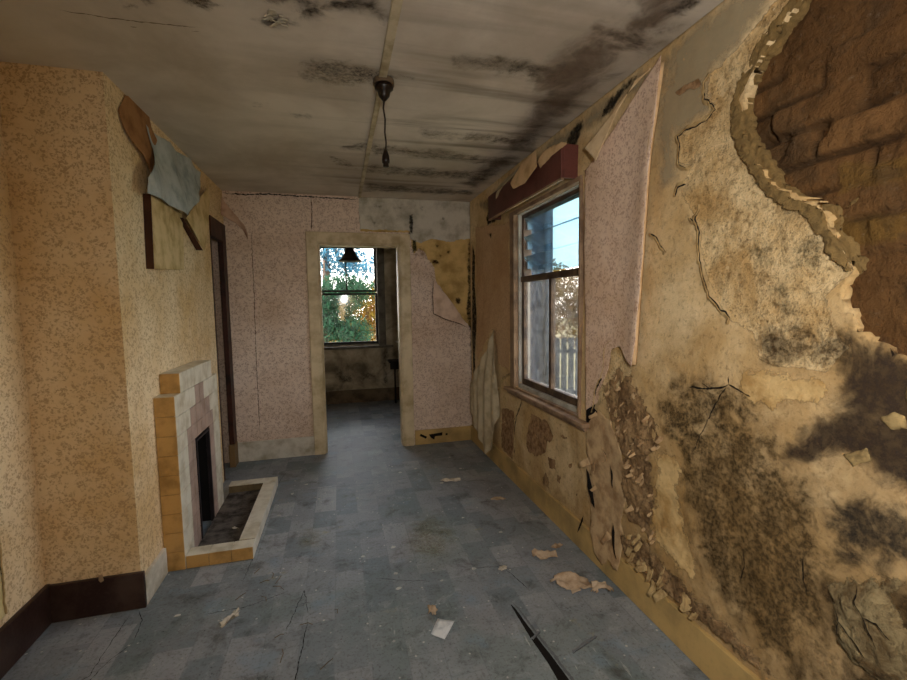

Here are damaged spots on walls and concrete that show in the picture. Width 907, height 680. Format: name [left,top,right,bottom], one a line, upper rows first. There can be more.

water stain [489,42,618,146]
water stain [602,78,636,117]
flaking render [358,197,471,325]
crack [673,180,686,197]
crack [688,204,730,325]
flaking render [675,0,907,411]
flaking render [586,347,770,674]
water stain [659,381,835,656]
water stain [763,326,907,484]
spalling [843,448,872,467]
water stain [830,501,907,563]
spalling [880,412,907,430]